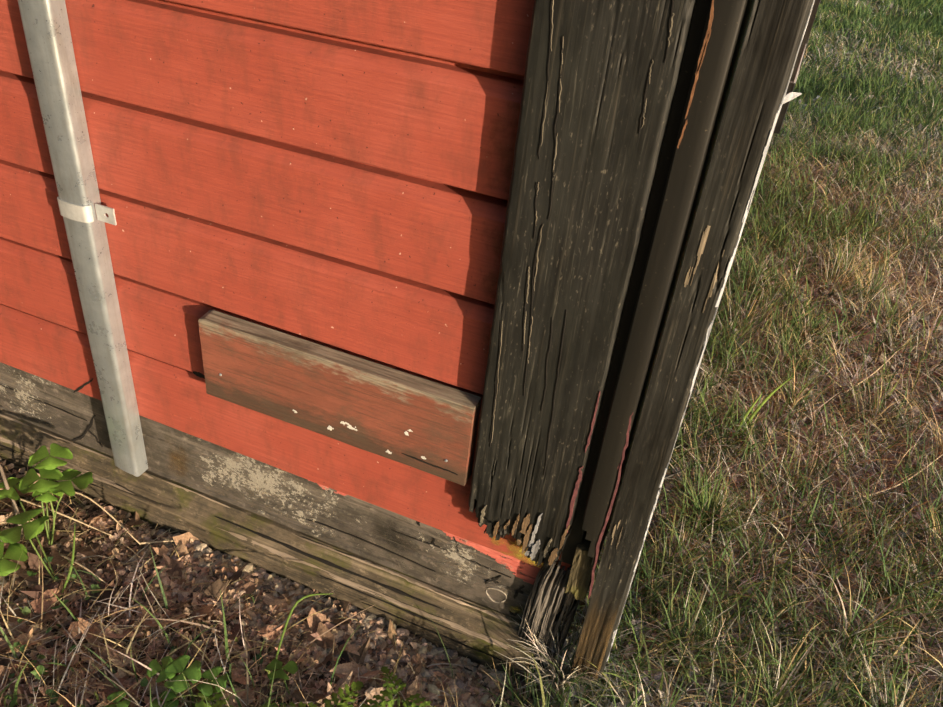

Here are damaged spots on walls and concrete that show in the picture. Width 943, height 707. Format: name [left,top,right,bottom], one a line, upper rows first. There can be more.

peeling [604,0,821,670]
leakage [0,414,114,460]
leakage [64,462,135,494]
leakage [142,473,230,508]
peeling [443,531,540,585]
leakage [219,528,520,650]